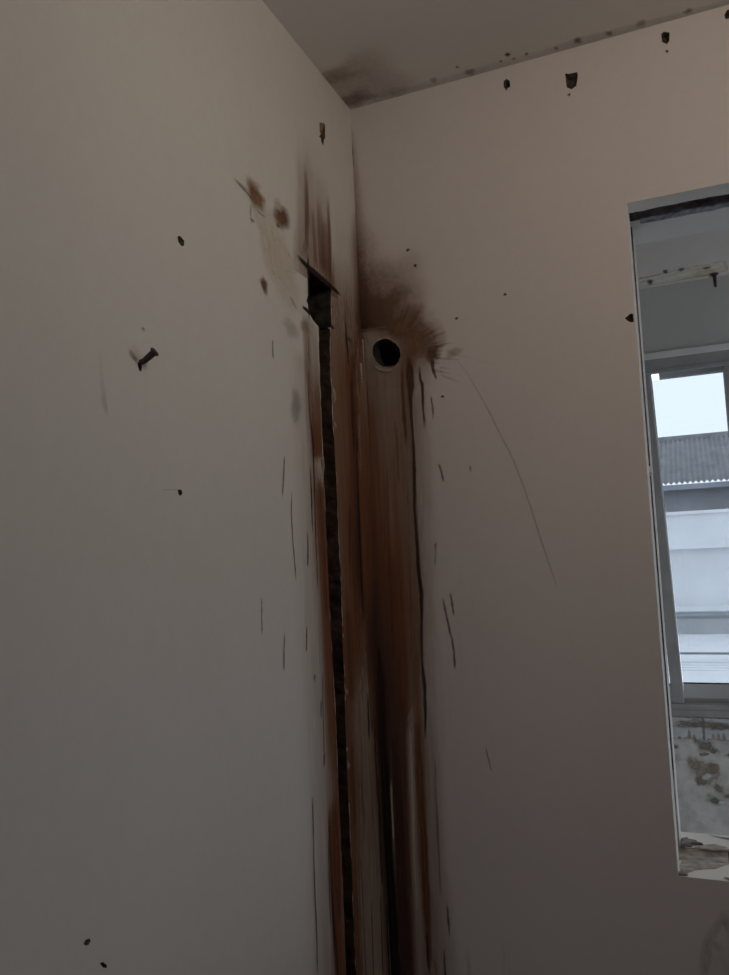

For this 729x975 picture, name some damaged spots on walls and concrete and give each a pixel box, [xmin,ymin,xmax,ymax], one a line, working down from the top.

corrosion [241,185,263,221]
corrosion [275,210,288,227]
corrosion [306,224,446,975]